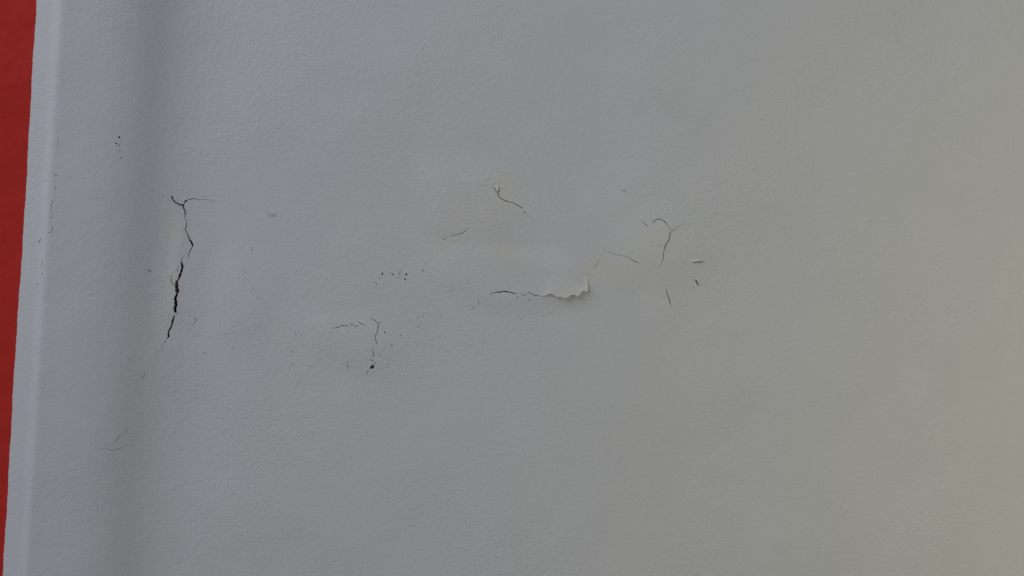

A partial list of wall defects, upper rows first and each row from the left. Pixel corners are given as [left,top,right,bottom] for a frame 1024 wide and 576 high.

crack [149,196,213,347]
flaking render [517,257,588,300]
crack [589,219,679,274]
crack [335,319,382,369]